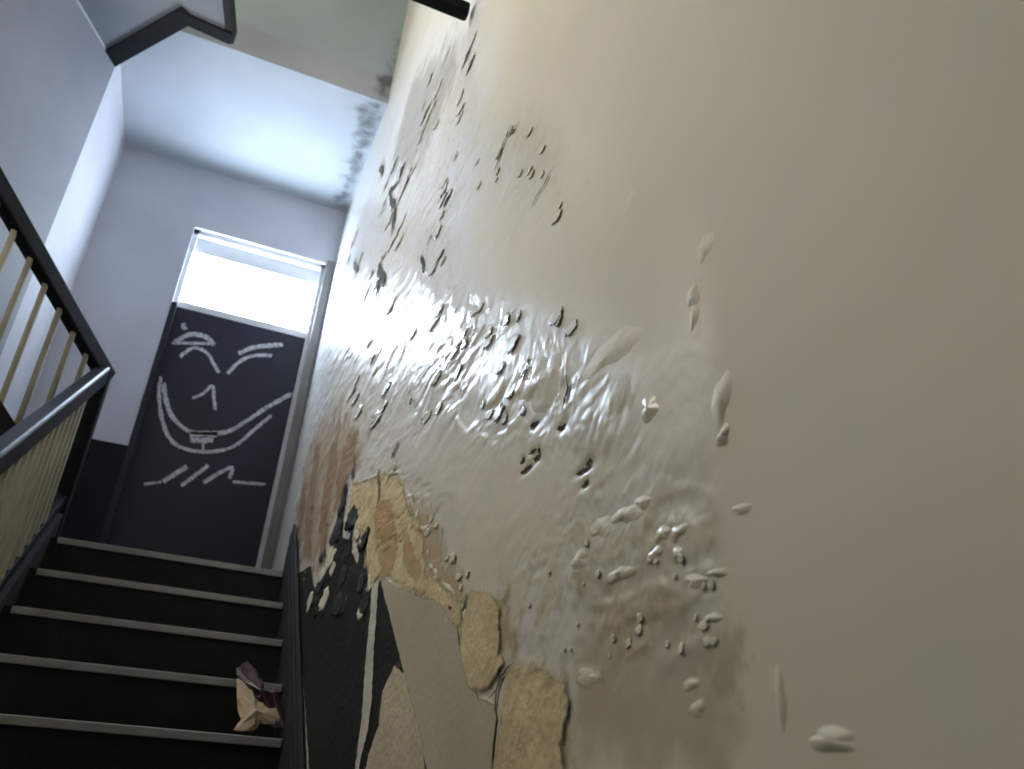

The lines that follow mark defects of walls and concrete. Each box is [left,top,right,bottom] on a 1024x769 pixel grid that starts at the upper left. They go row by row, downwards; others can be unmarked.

peeling [381,155,417,260]
peeling [428,178,452,276]
peeling [368,381,391,430]
peeling [306,469,568,769]